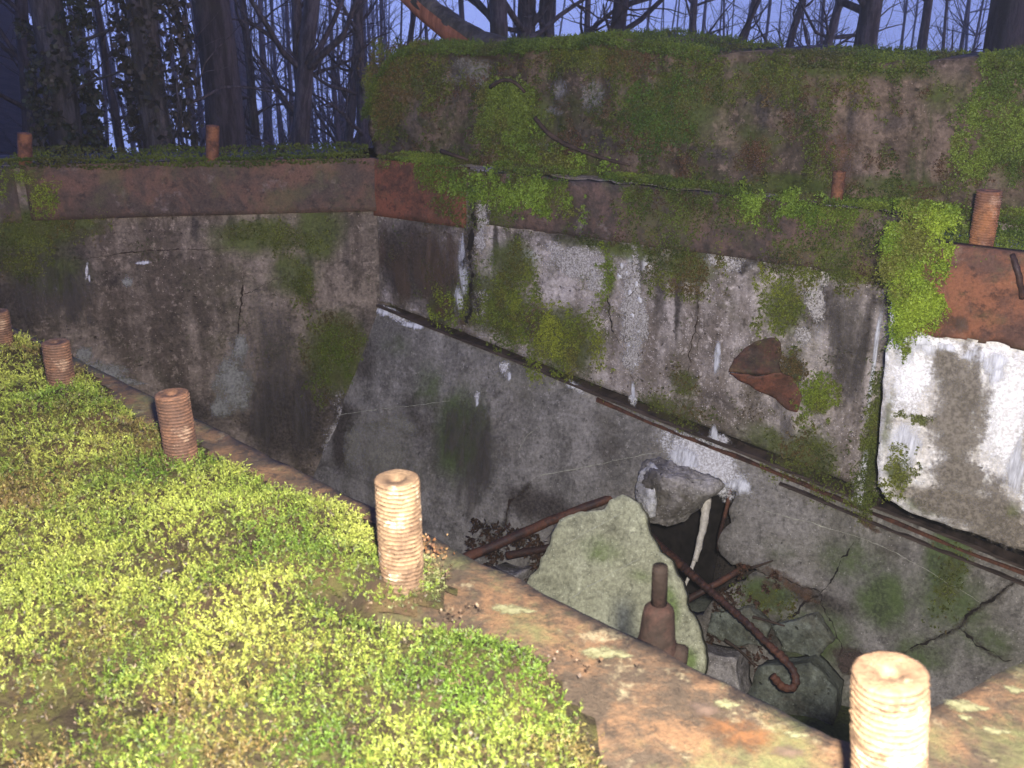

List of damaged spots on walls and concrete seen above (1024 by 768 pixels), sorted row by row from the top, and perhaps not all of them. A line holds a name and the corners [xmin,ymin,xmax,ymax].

crack [237,274,286,337]
crack [460,197,480,324]
water stain [888,335,1024,546]
crack [757,509,1022,662]